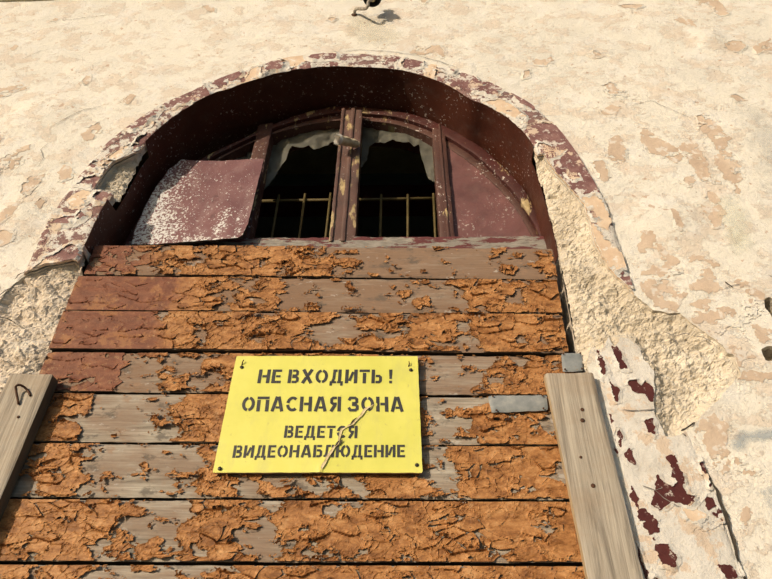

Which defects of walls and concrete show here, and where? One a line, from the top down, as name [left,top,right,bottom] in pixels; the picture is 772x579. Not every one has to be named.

spalling [46,100,196,230]
peeling [640,113,746,230]
peeling [0,135,772,579]